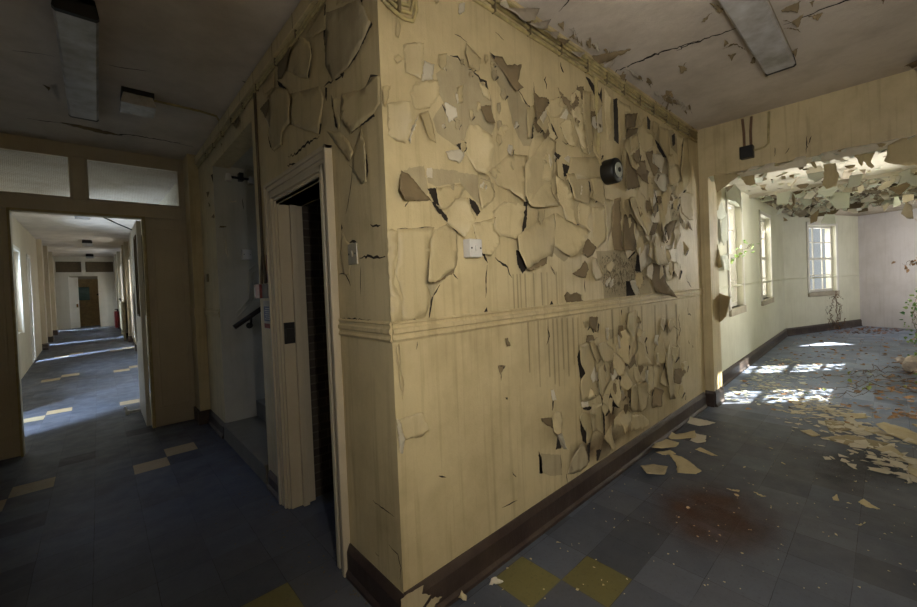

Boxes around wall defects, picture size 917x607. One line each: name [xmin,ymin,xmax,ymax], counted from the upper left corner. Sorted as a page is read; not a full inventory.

peeling [781,0,823,32]
crack [784,0,849,25]
crack [615,28,736,73]
peeling [709,135,917,271]
peeling [719,293,731,323]
peeling [538,310,693,478]